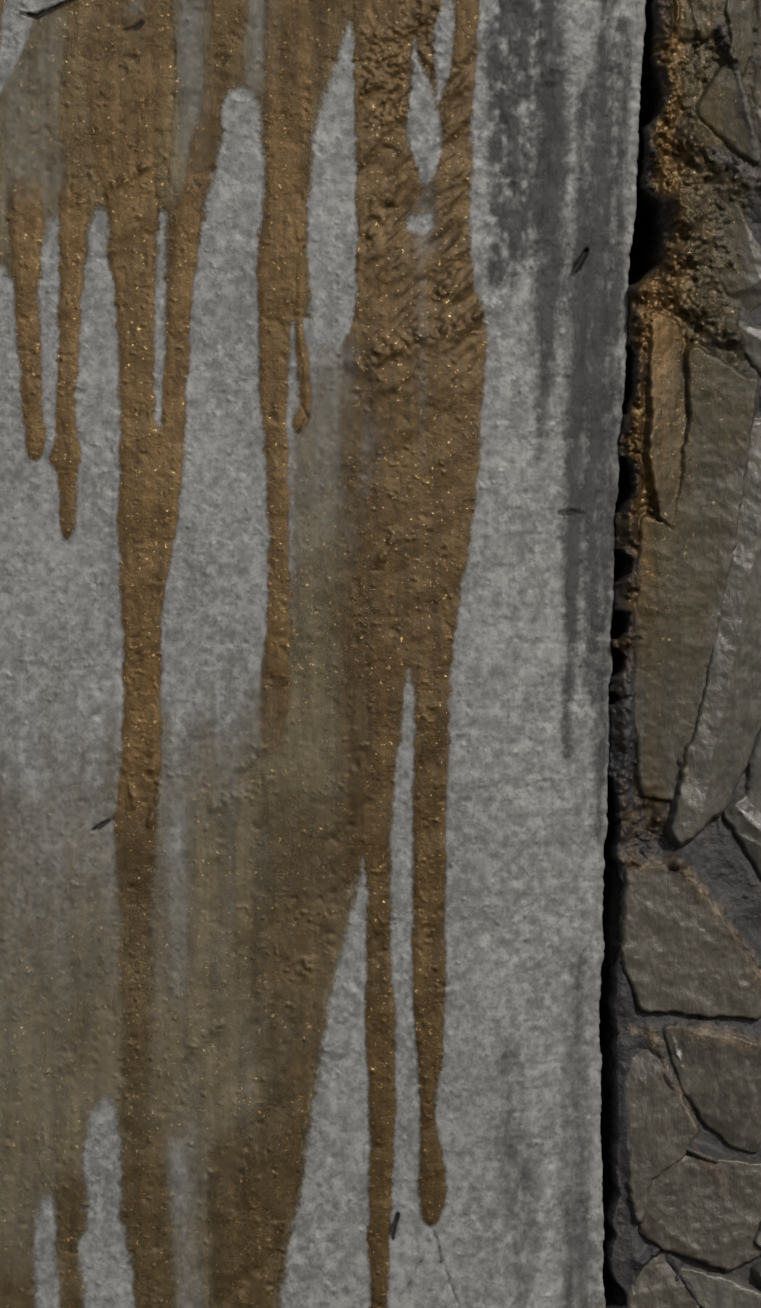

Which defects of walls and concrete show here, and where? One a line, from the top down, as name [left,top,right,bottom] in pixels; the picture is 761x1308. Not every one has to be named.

crack [637,7,656,161]
crack [628,195,656,287]
crack [621,350,629,406]
crack [615,464,628,509]
crack [614,554,631,581]
crack [608,612,626,702]
crack [599,792,626,1306]